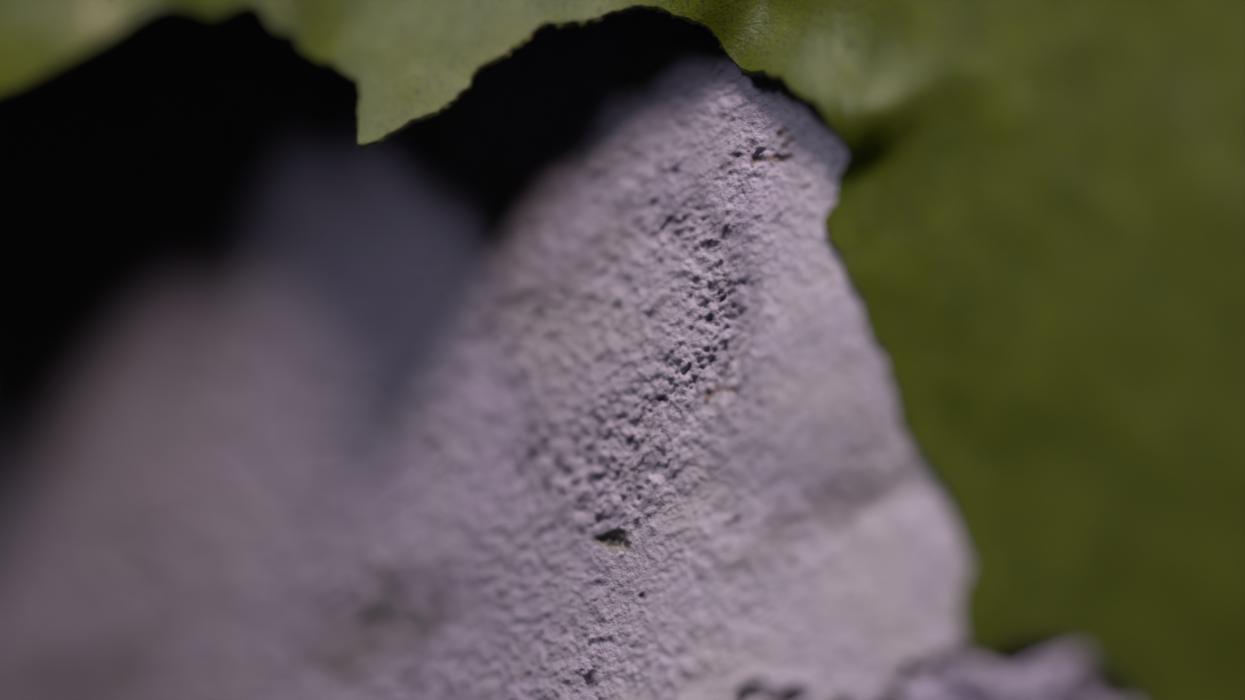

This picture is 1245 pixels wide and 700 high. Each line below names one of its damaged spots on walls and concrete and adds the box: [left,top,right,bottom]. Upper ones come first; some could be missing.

peeling [0,0,973,211]
flaking render [485,198,758,556]
peeling [822,0,1245,700]